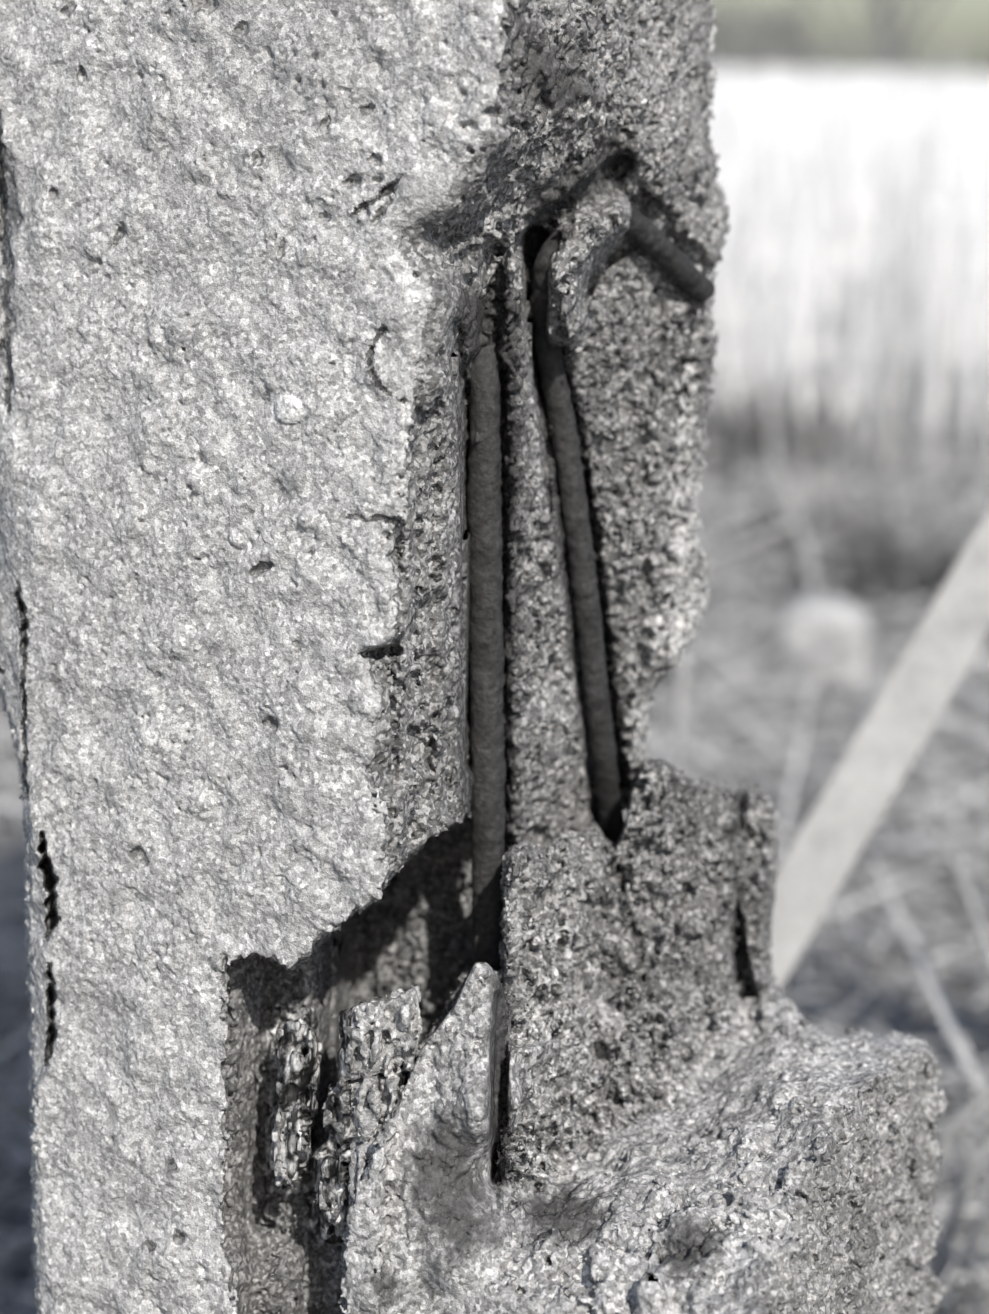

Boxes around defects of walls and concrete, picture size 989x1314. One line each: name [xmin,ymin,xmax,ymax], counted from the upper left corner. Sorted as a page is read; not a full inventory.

crack [0,109,13,415]
crack [0,581,30,798]
spalling [216,96,931,1314]
crack [36,830,61,1069]